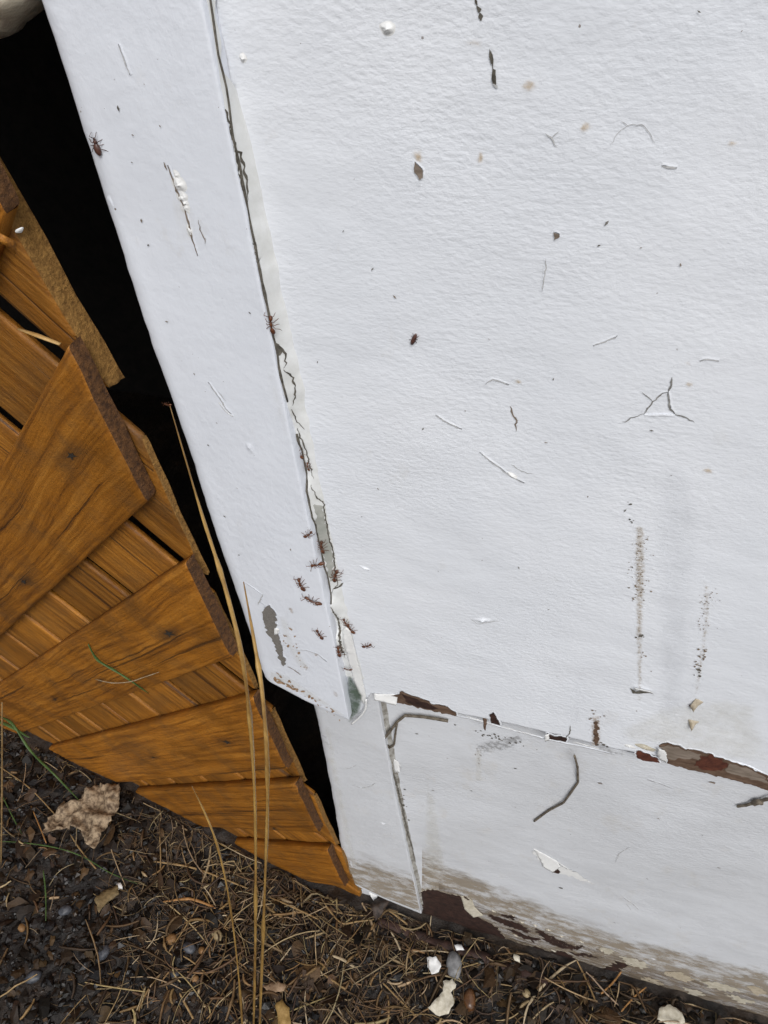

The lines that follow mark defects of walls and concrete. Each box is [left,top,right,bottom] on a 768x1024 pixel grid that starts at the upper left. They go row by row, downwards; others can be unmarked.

crack [208,0,345,662]
crack [626,379,694,422]
peeling [246,583,299,674]
peeling [343,627,458,725]
peeling [624,741,768,791]
peeling [533,849,593,889]